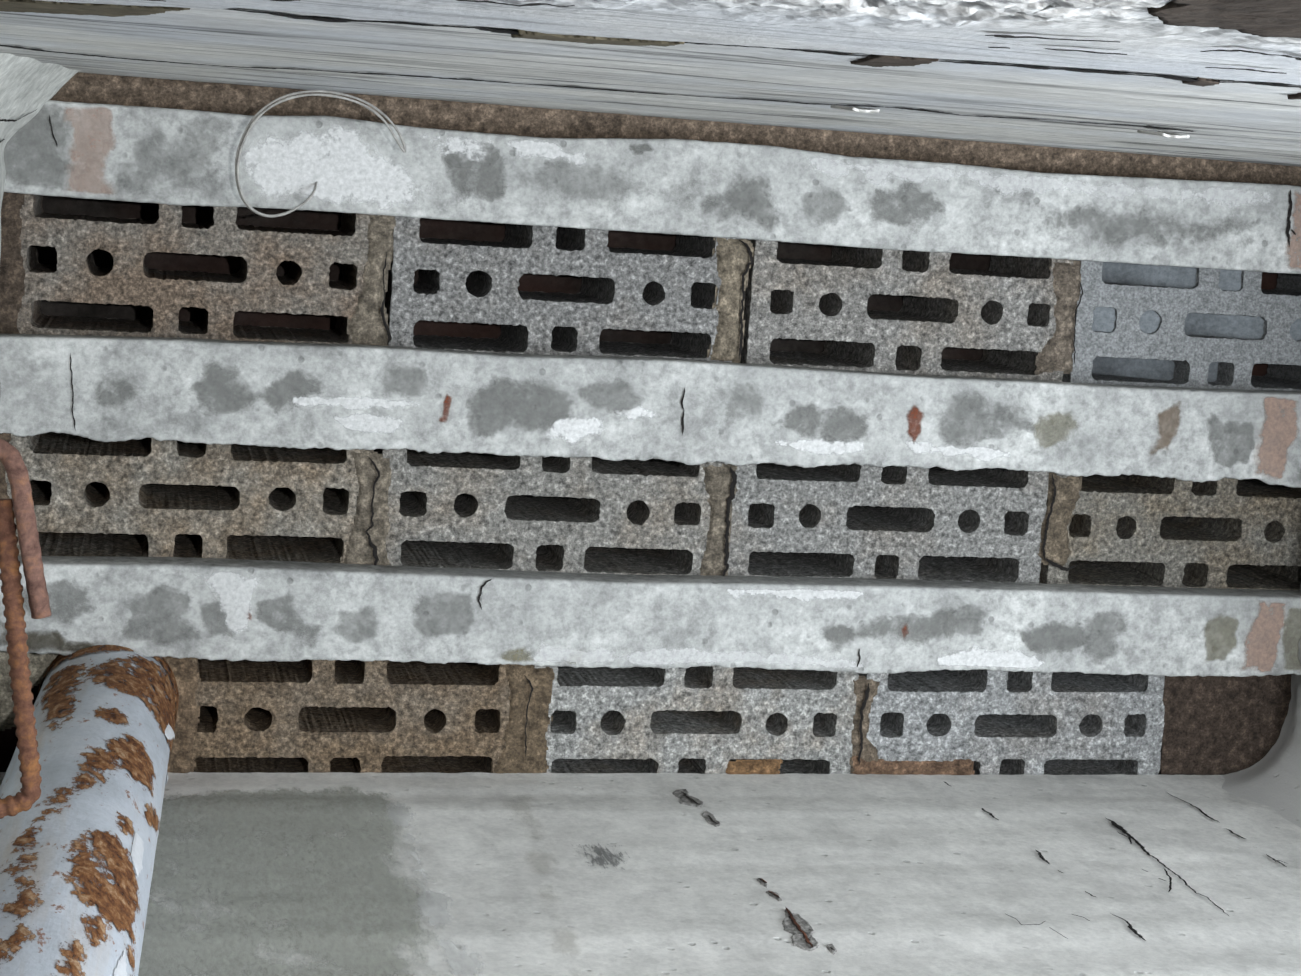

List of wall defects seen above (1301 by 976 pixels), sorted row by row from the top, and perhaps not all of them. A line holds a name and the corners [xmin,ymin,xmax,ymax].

peeling [0,0,1301,139]
crack [365,458,380,565]
crack [1042,474,1077,571]
crack [857,649,870,765]
water stain [138,787,429,976]
crack [1006,850,1146,941]
crack [1106,818,1229,916]
crack [1168,793,1288,867]